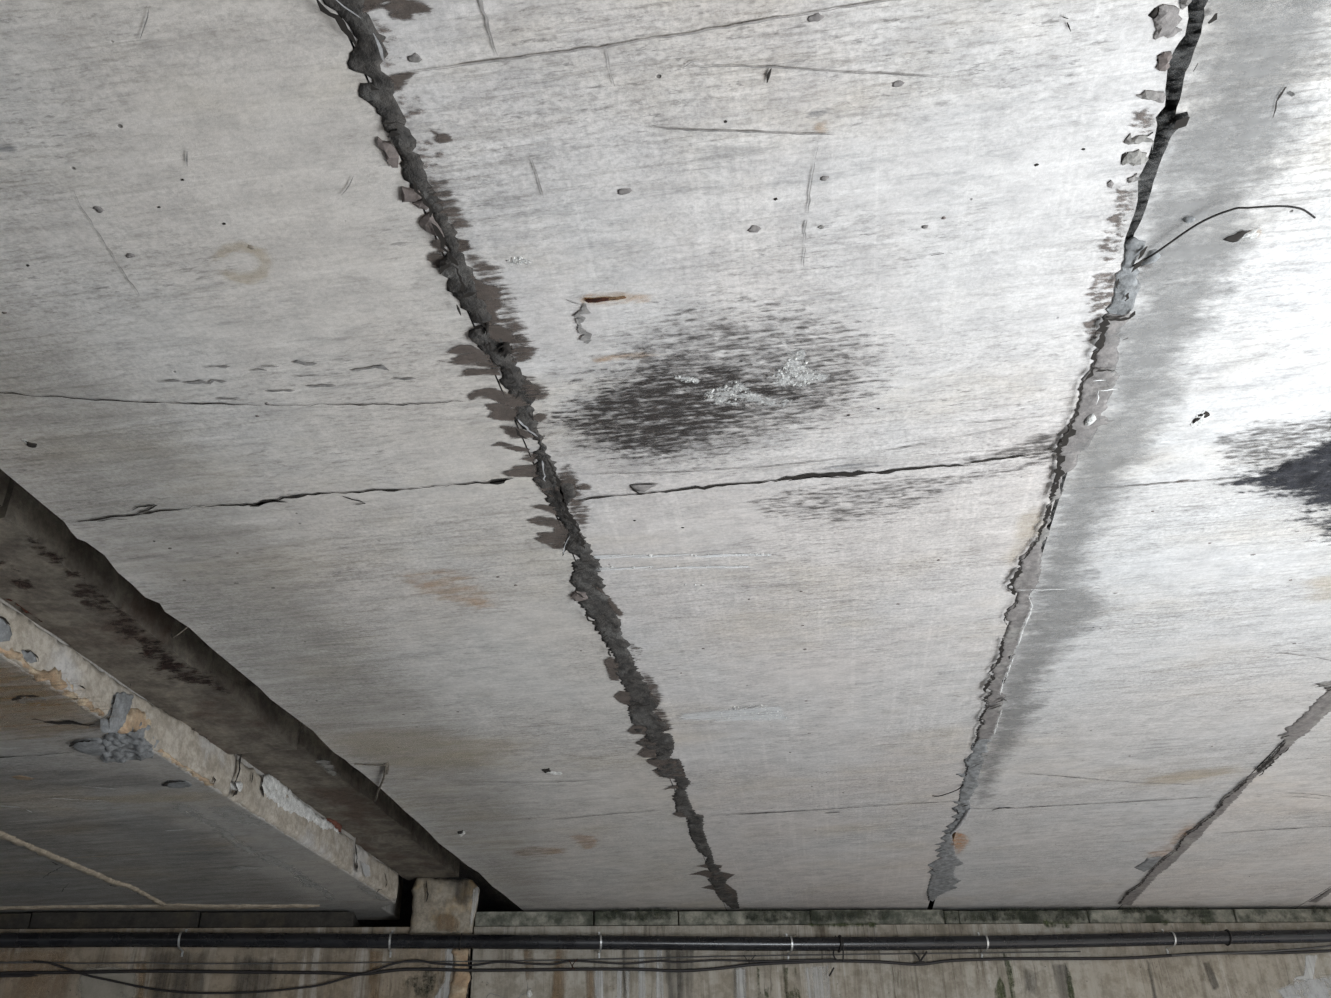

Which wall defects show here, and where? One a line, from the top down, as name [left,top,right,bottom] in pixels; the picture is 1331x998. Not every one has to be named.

crack [316,0,357,47]
crack [1173,117,1190,130]
leakage [982,0,1326,798]
crack [74,180,1331,905]
spalling [0,647,105,716]
spalling [118,708,152,734]